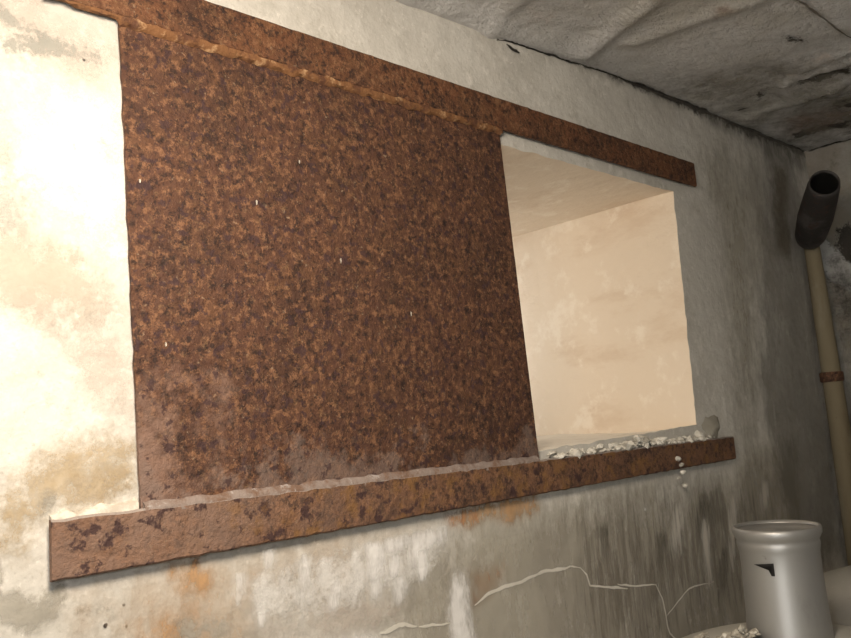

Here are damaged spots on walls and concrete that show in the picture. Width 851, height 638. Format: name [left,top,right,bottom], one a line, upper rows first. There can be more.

crack [797,0,851,38]
damp [0,442,134,547]
rust [449,499,535,527]
damp [253,527,446,626]
crack [380,622,450,634]
damp [449,575,473,638]
crack [475,565,714,638]